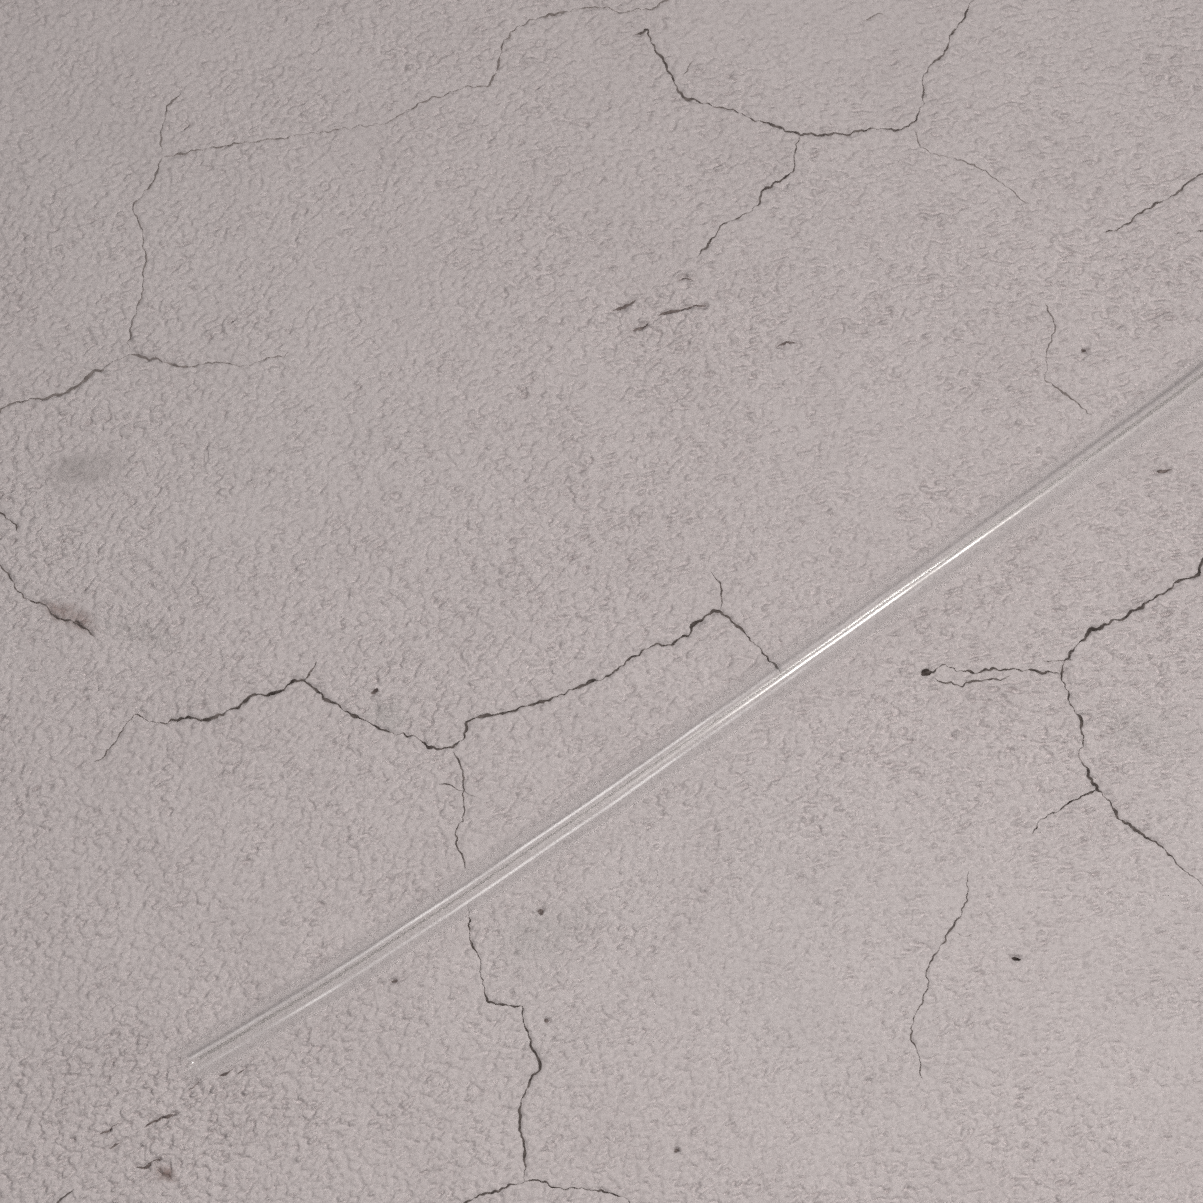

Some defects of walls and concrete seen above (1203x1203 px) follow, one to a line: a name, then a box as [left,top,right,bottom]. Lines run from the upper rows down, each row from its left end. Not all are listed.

crack [0,0,1030,412]
crack [1106,173,1203,232]
crack [1045,303,1089,414]
crack [0,565,94,637]
crack [96,572,781,869]
crack [925,558,1203,882]
crack [464,909,630,1203]
crack [910,872,970,1075]